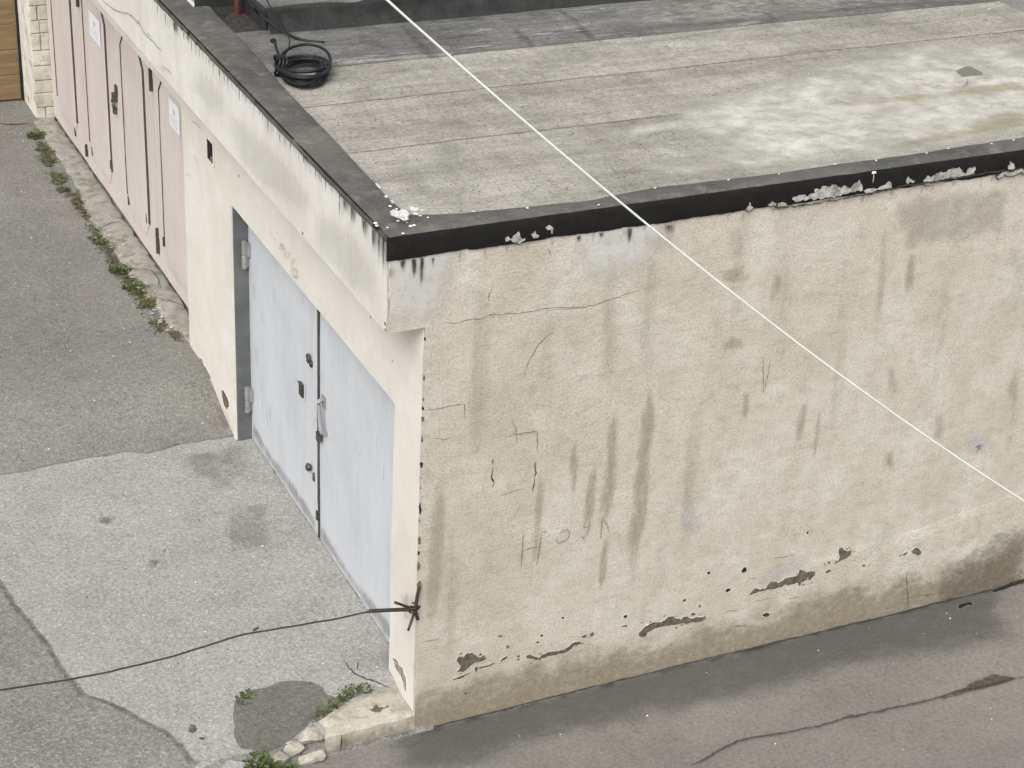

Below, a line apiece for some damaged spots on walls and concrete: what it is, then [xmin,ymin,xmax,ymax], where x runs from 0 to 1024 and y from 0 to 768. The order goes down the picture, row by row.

peeling [767,179,892,208]
peeling [905,166,976,186]
peeling [995,160,1024,180]
leakage [339,194,453,316]
peeling [504,224,554,244]
crack [443,290,638,366]
flaking render [748,546,854,596]
flaking render [452,631,595,681]
flaking render [620,604,707,638]
leakage [415,550,1014,726]